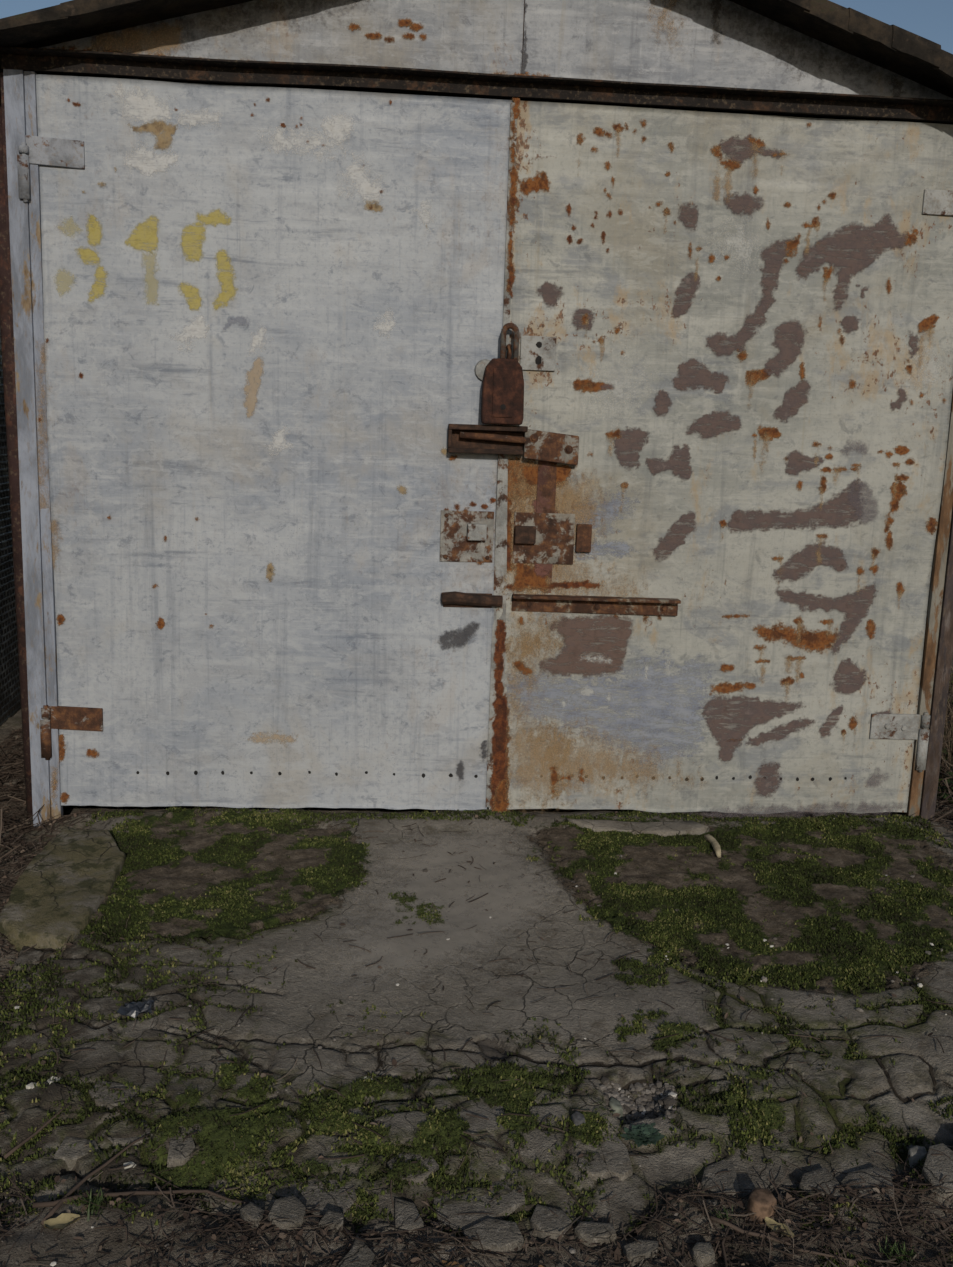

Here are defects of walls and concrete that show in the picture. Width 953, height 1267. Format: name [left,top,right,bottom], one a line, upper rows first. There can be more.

rust [349,19,426,42]
rust [918,314,939,333]
rust [444,458,635,597]
rust [926,517,938,535]
rust [709,614,839,695]
rust [865,619,876,639]
rust [490,615,658,812]
rust [52,734,69,803]
crack [0,931,262,1032]
crack [2,967,951,1179]
crack [369,1143,487,1197]